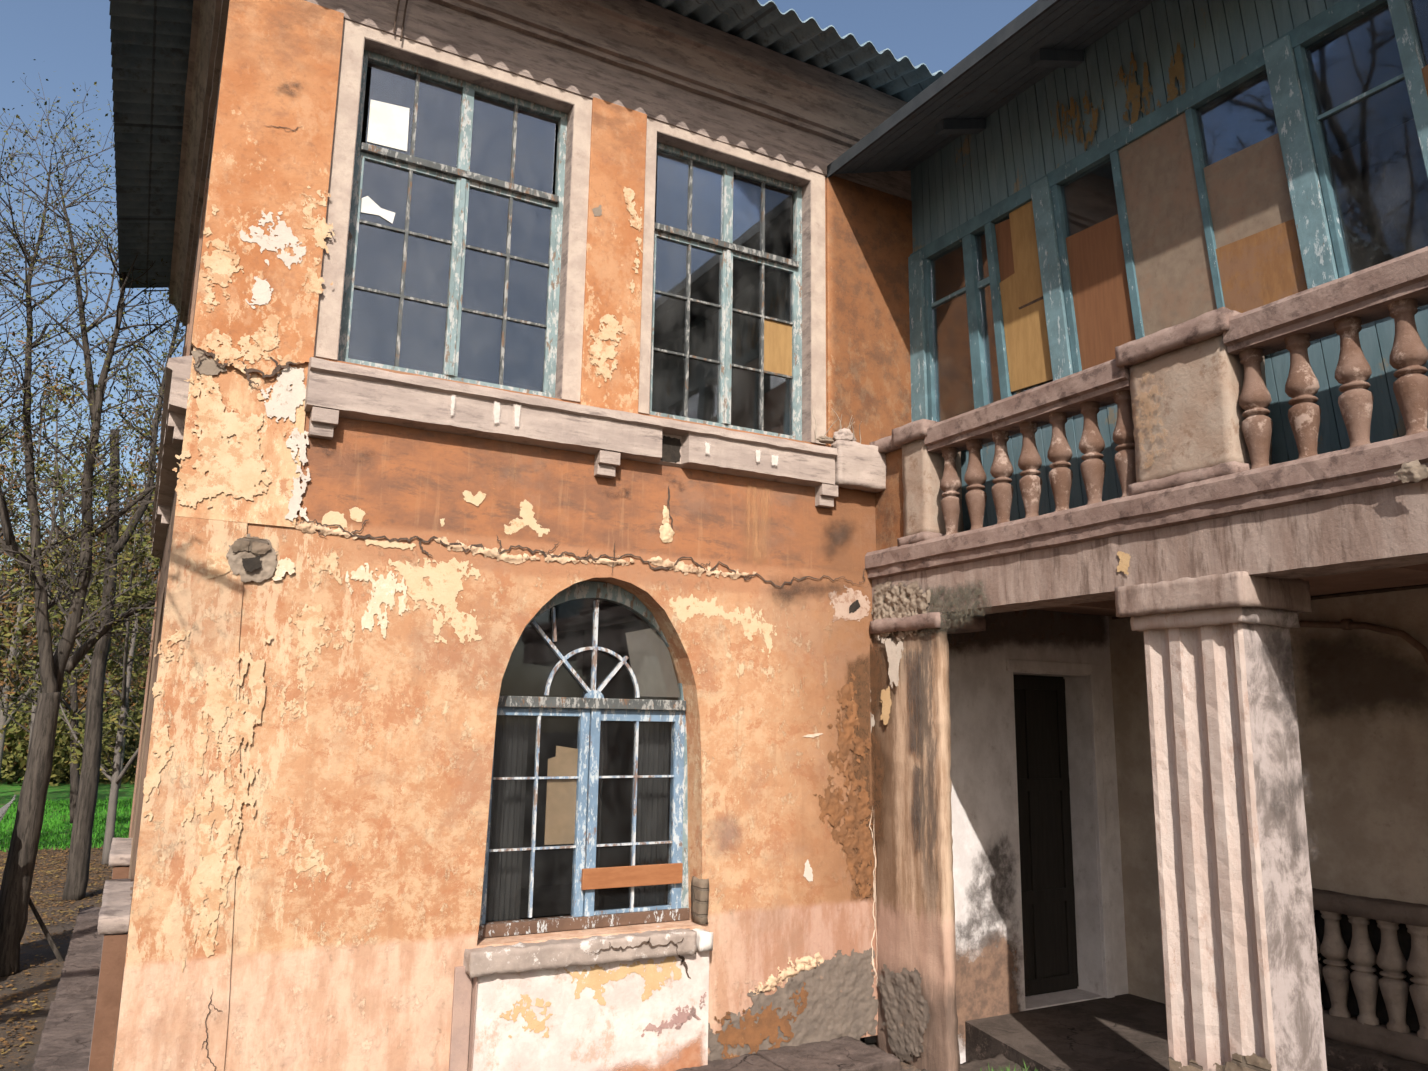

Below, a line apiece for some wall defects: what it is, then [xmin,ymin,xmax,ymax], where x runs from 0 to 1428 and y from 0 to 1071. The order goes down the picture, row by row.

peeling [154,627,190,662]
peeling [170,186,757,972]
crack [292,486,866,588]
peeling [669,594,777,658]
peeling [143,723,174,821]
spalling [815,580,931,900]
crack [201,992,221,1071]
peeling [499,994,553,1038]
peeling [564,956,682,1006]
spalling [641,948,931,1068]
water stain [956,932,1022,1046]
flaking render [1169,1053,1272,1071]